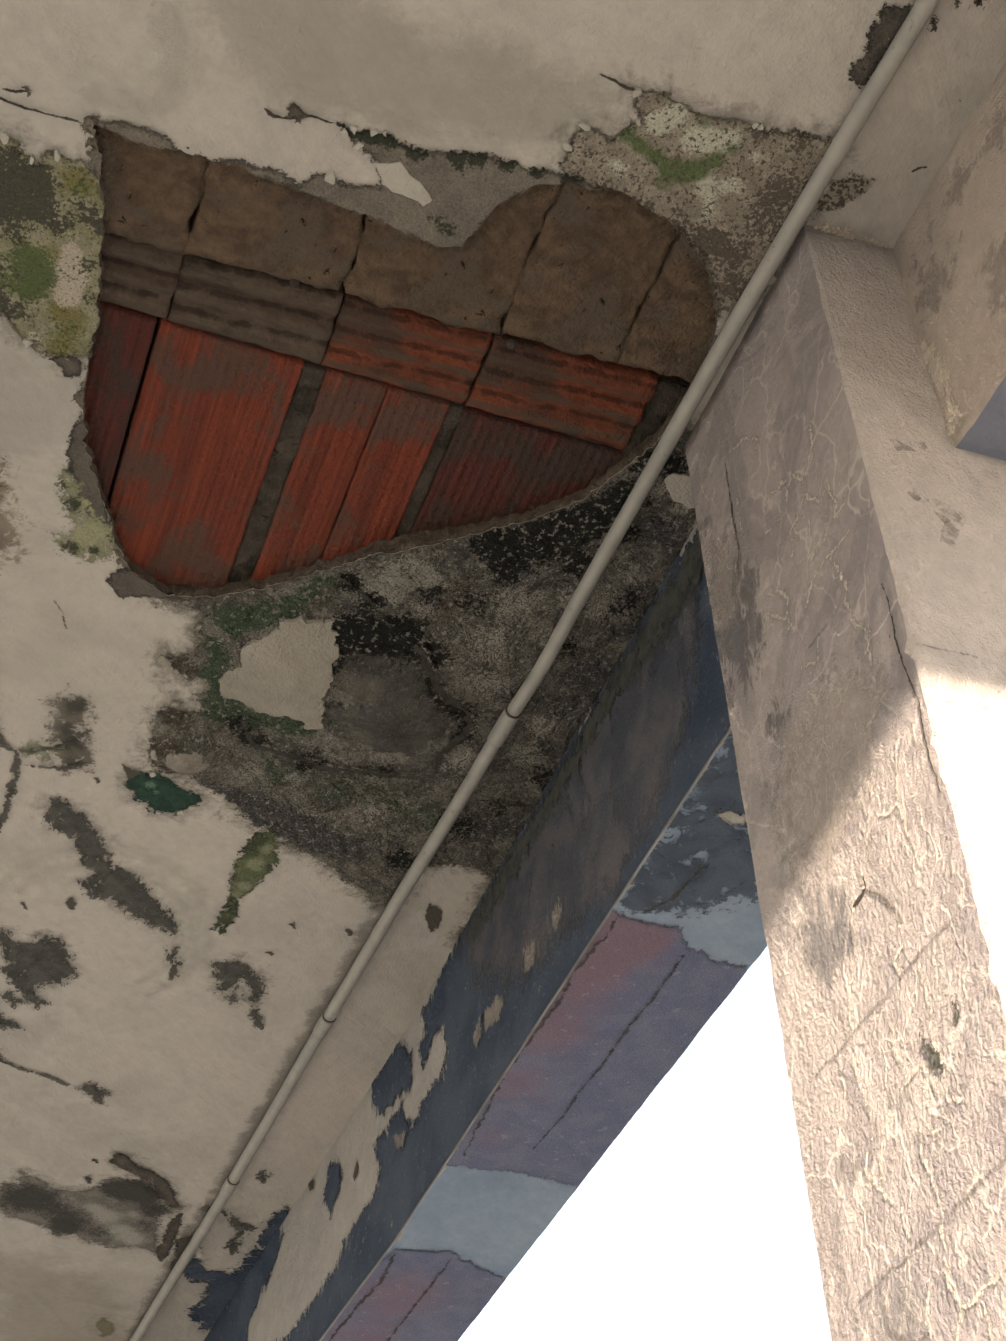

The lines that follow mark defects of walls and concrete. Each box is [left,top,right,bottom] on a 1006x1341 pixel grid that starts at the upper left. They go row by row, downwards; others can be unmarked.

crack [0,86,91,126]
peeling [762,170,875,295]
flaking render [48,74,835,601]
leakage [45,683,97,776]
leakage [0,928,79,1031]
leakage [41,796,183,981]
leakage [211,958,268,1030]
peeling [276,529,747,1341]
crack [717,419,1002,1341]
leakage [0,1055,111,1104]
leakage [0,1153,201,1270]
peeling [182,1206,290,1341]